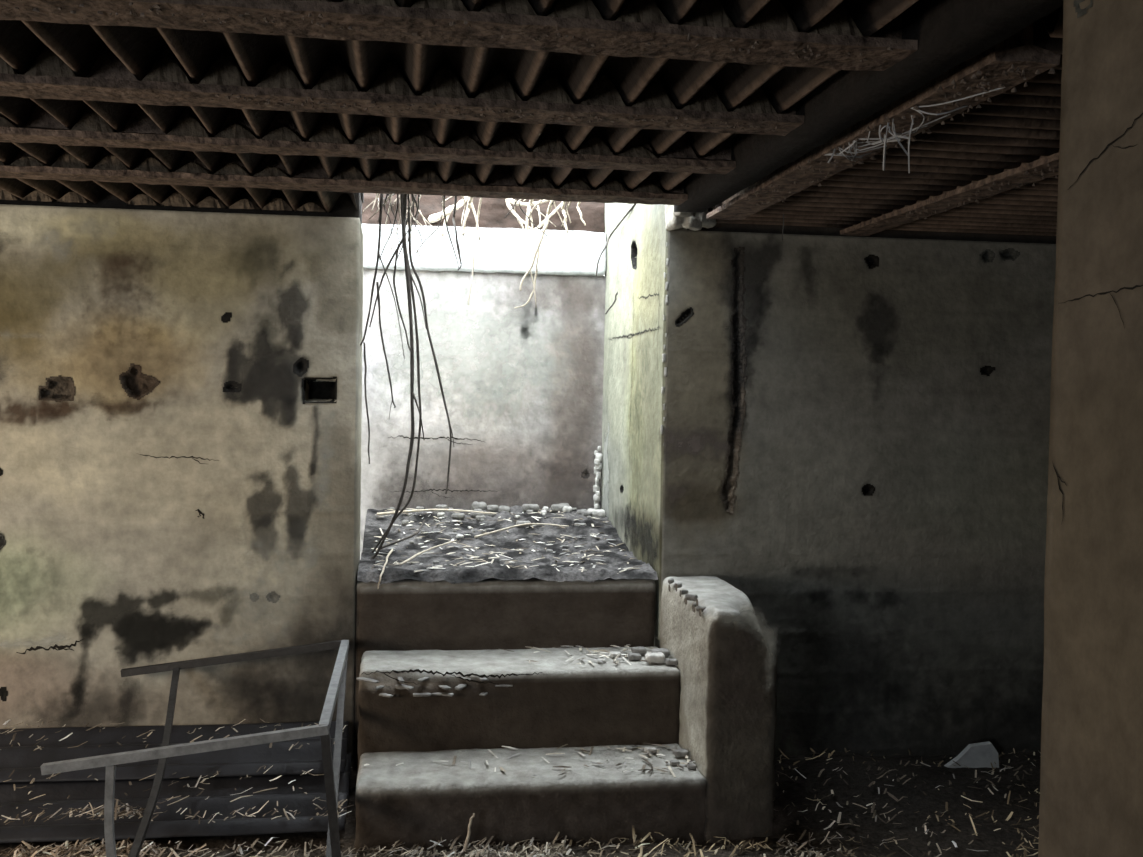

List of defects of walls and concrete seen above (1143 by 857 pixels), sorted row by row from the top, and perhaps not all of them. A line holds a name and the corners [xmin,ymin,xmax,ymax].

crack [1069,113,1143,188]
damp [727,245,779,384]
crack [1063,285,1143,328]
spalling [39,375,75,402]
spalling [119,363,160,400]
damp [226,286,308,425]
damp [247,467,315,548]
damp [81,591,209,662]
spalling [668,578,706,617]
spalling [356,677,513,698]